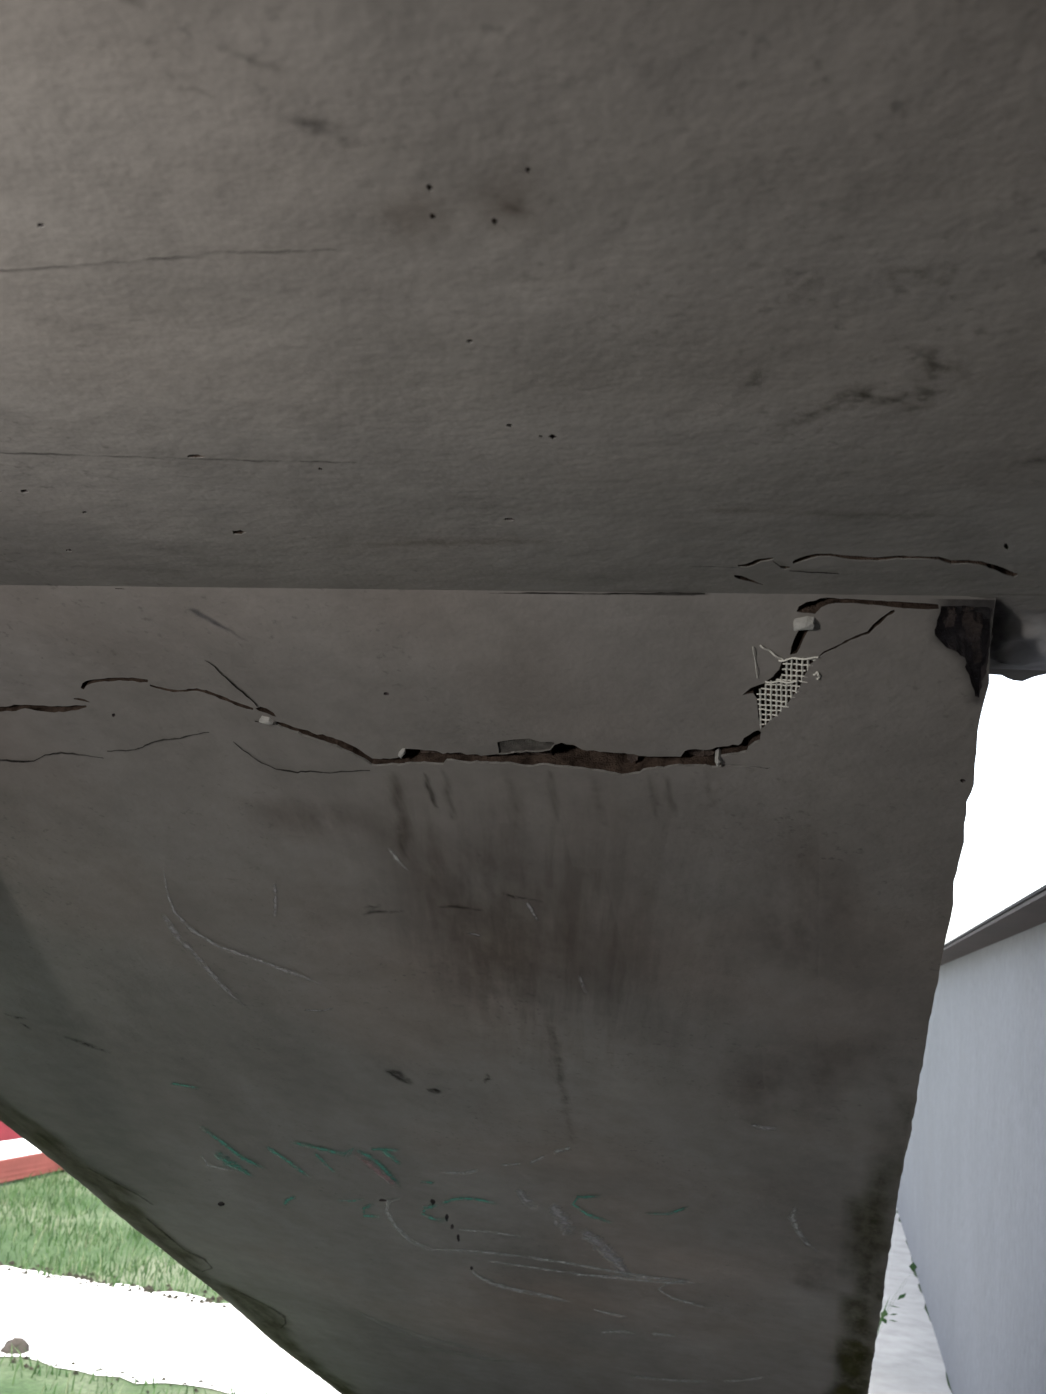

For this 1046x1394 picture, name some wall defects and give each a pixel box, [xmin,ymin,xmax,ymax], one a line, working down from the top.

crack [0,554,1018,776]